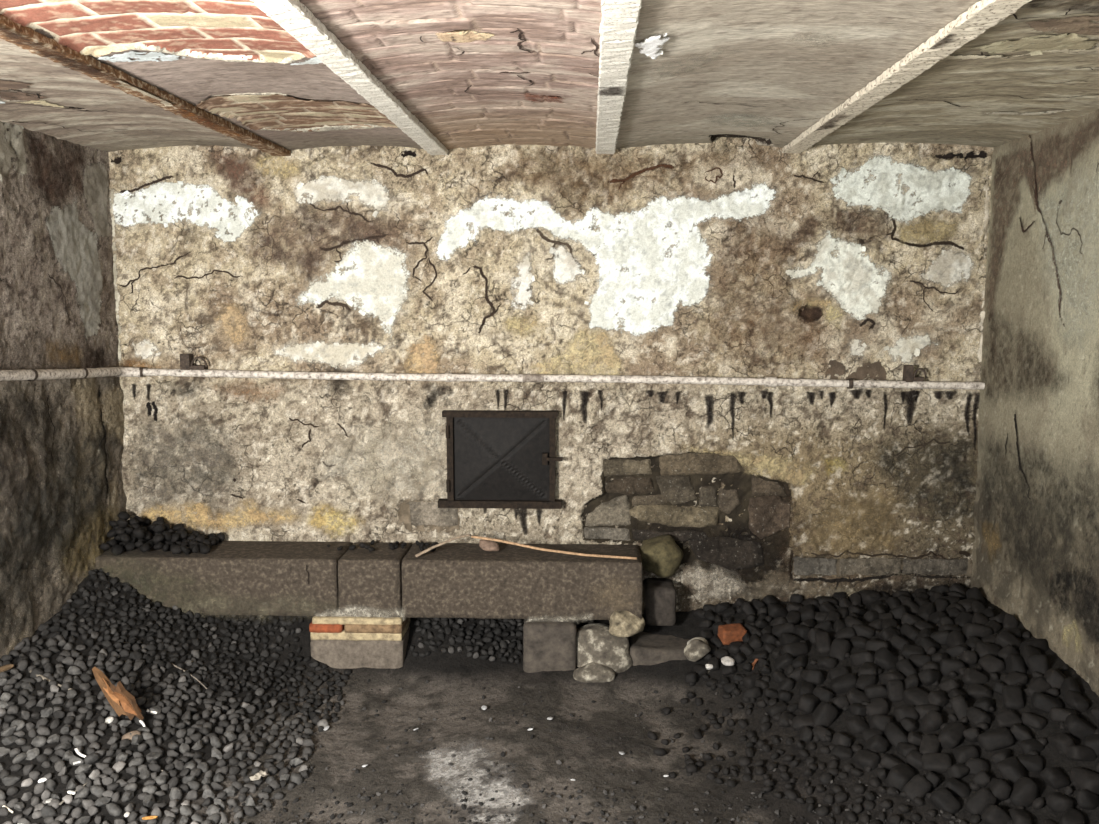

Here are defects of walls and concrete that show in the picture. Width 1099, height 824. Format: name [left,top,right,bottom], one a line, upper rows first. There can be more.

flaking render [0,0,323,65]
peeling [46,162,259,361]
crack [316,300,350,311]
peeling [296,240,410,336]
crack [310,203,437,306]
crack [463,265,501,333]
peeling [436,182,776,336]
crack [859,218,967,251]
leakage [495,389,508,410]
leakage [807,390,835,406]
leakage [850,389,871,399]
leakage [881,115,1099,652]